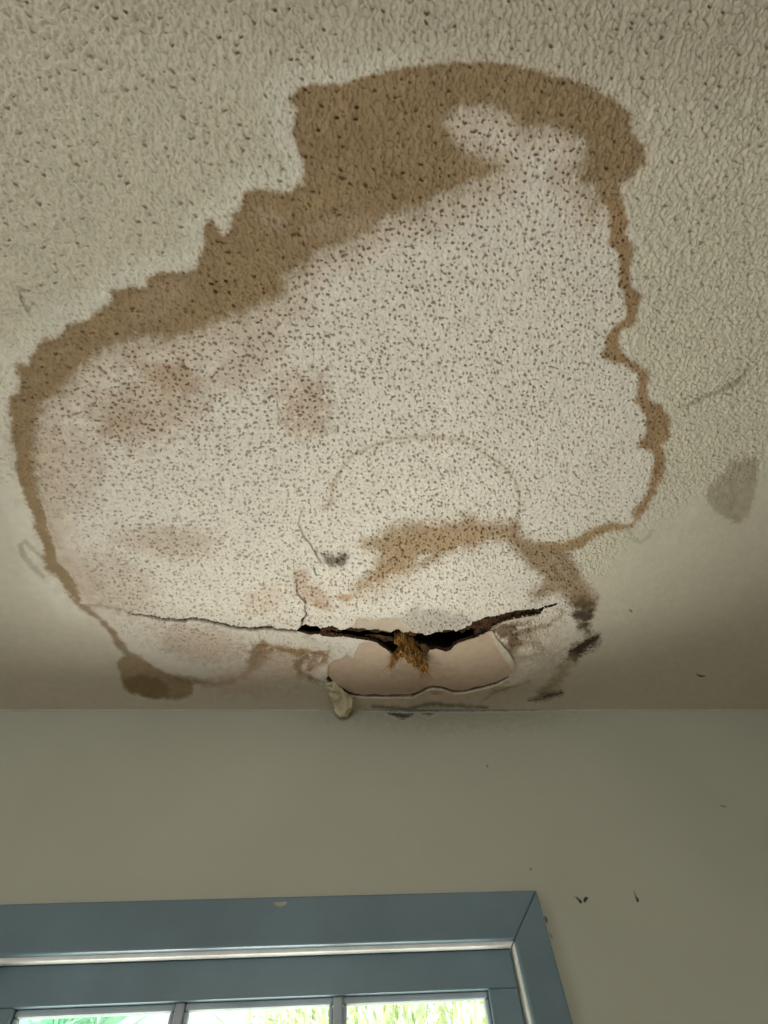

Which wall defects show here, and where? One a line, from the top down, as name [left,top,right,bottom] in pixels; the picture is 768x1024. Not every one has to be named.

leakage [0,48,674,742]
leakage [703,452,762,527]
crack [80,509,322,633]